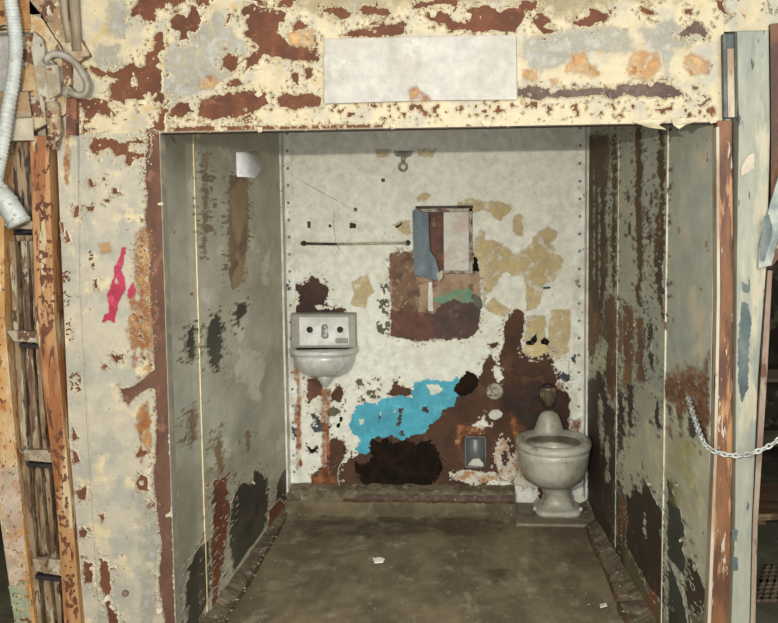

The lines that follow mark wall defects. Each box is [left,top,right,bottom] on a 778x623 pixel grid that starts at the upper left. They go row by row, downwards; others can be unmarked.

peeling [59,0,632,247]
peeling [34,165,71,337]
peeling [176,152,255,379]
rust [117,118,387,623]
peeling [286,272,347,317]
peeling [374,245,488,347]
peeling [299,305,575,501]
peeling [448,0,737,623]
rust [664,359,708,439]
peeling [0,466,32,623]
peeling [51,422,127,623]
peeling [176,400,287,623]